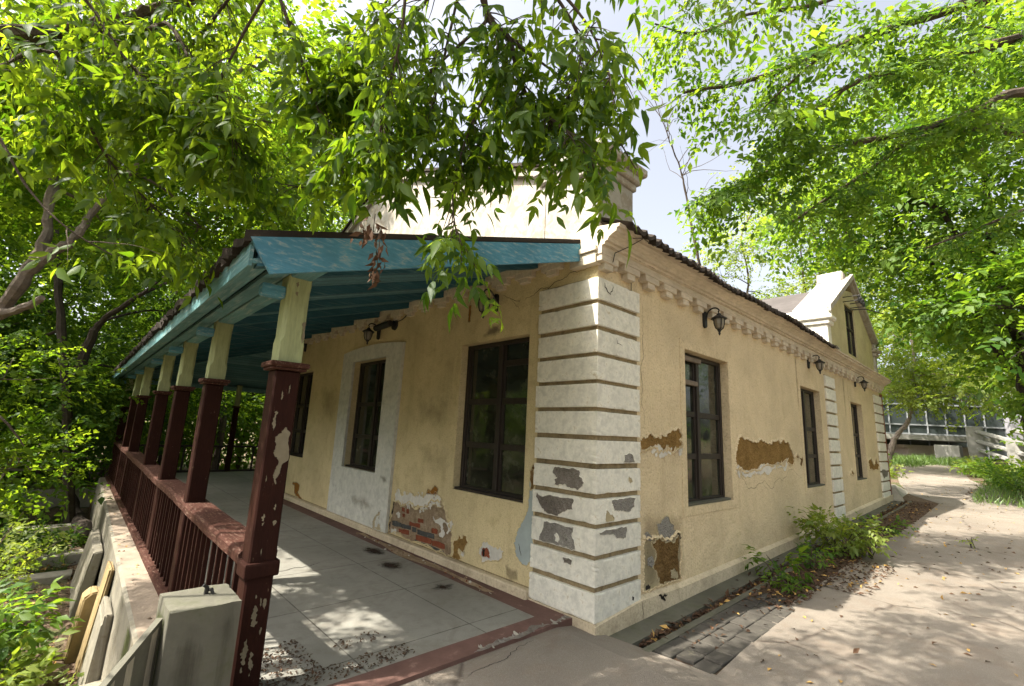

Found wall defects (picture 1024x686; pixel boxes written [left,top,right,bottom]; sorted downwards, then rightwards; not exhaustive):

peeling [266,386,291,485]
flaking render [624,426,683,463]
flaking render [735,434,803,478]
flaking render [868,457,888,479]
flaking render [372,464,585,566]
peeling [599,497,636,539]
flaking render [641,515,682,594]
peeling [250,595,267,634]
peeling [240,639,253,676]